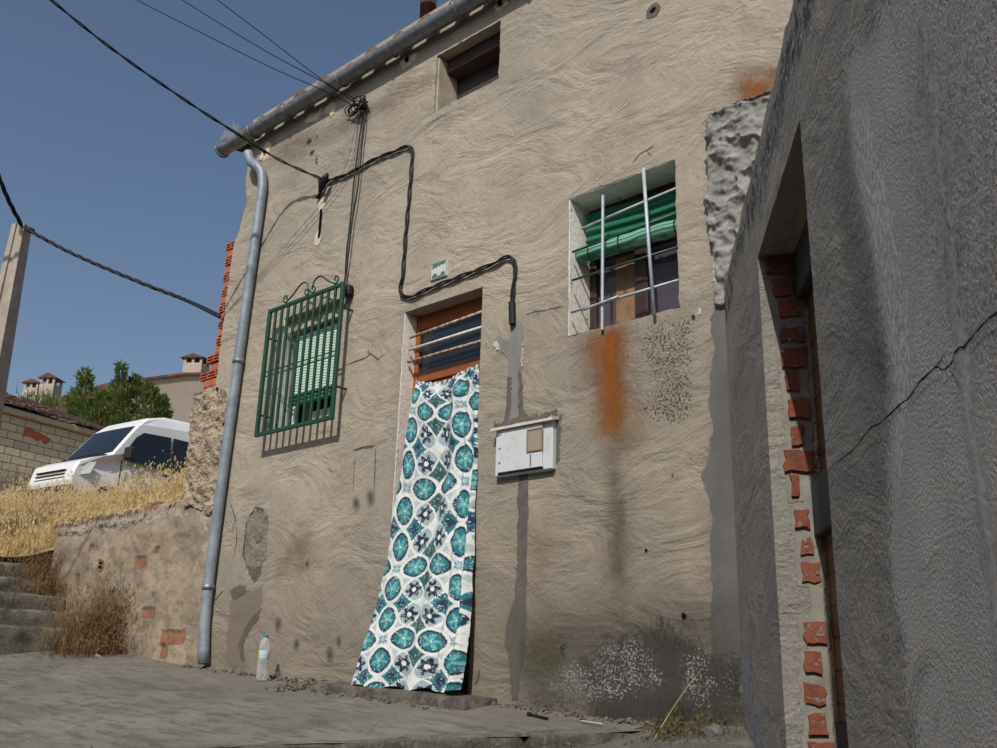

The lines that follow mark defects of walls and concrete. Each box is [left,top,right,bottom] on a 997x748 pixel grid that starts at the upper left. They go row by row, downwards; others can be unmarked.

peeling [712,0,811,319]
corrosion [594,332,622,440]
leakage [633,319,693,424]
crack [829,312,997,473]
spalling [159,627,186,658]
flaking render [226,506,269,667]
leakage [534,618,762,748]